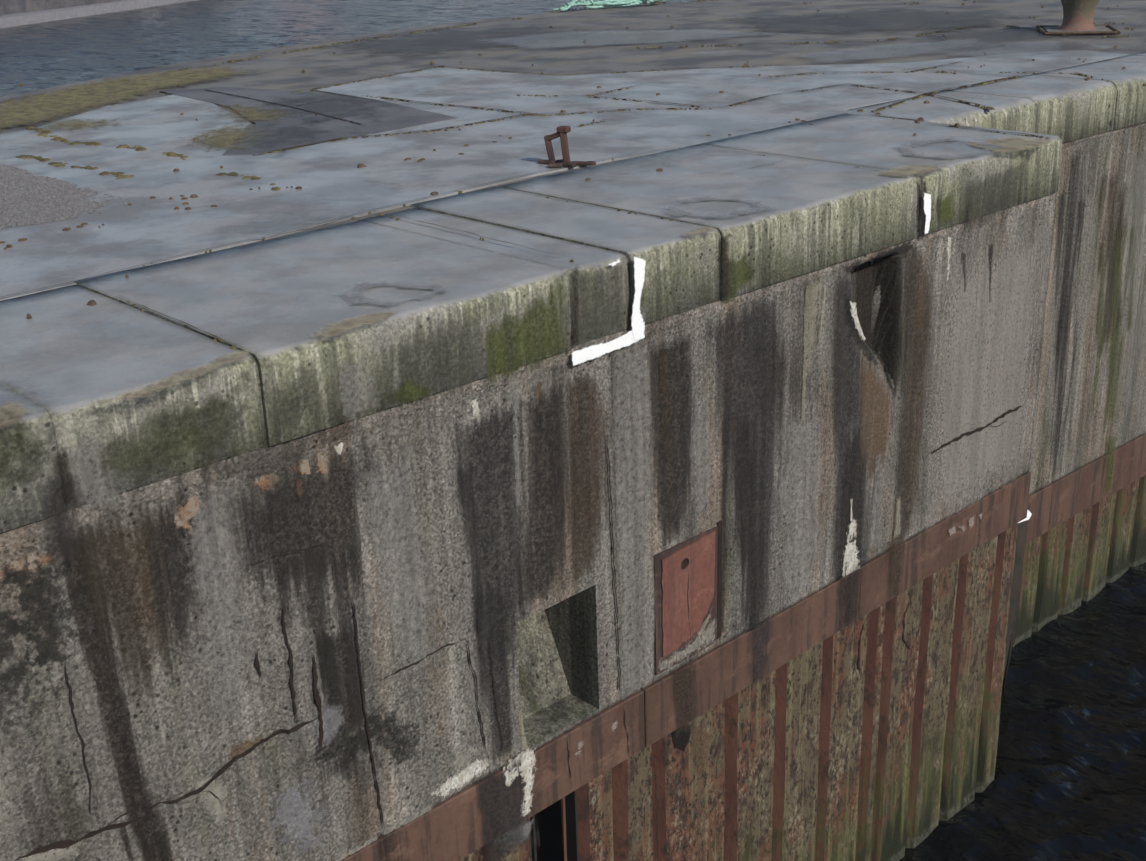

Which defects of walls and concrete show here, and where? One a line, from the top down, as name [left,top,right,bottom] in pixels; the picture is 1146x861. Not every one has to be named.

damp [0,441,173,861]
crack [15,595,505,861]
rust [255,473,277,492]
damp [152,454,434,763]
rust [297,443,343,497]
damp [457,389,565,861]
rust [570,377,608,578]
spalling [846,243,913,397]
rust [896,251,930,539]
crack [932,405,1024,453]
damp [1052,155,1088,468]